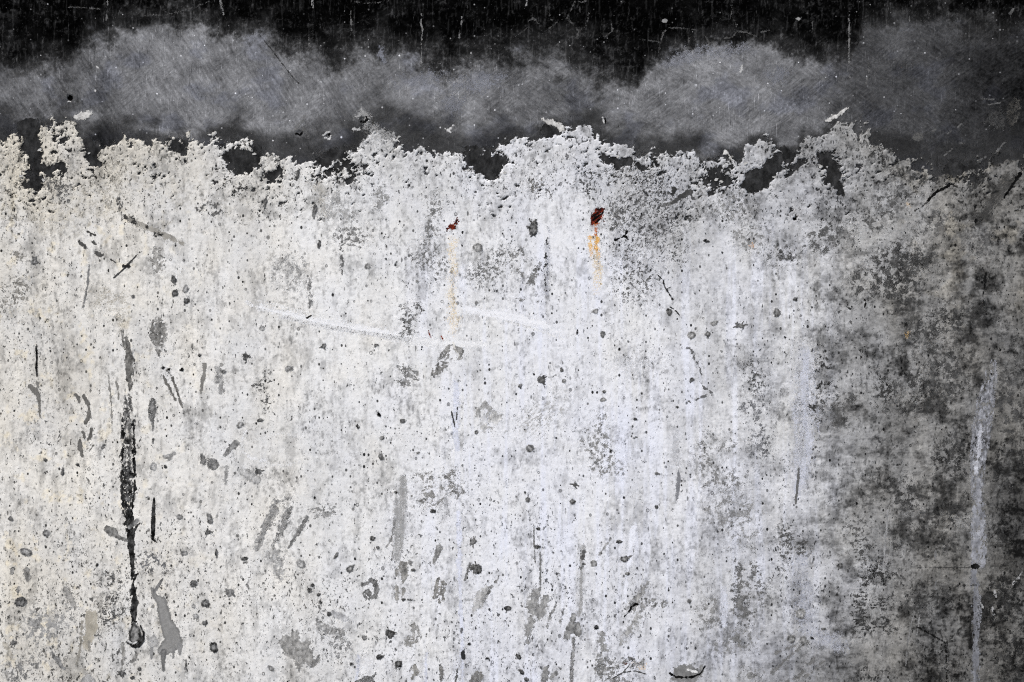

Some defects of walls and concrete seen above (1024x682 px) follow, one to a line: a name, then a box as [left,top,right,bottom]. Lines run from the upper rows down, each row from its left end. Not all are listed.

peeling [16,110,103,197]
peeling [164,138,190,162]
peeling [219,143,283,189]
peeling [295,115,368,185]
peeling [462,144,515,181]
peeling [540,117,565,138]
peeling [599,149,658,171]
peeling [694,145,846,197]
rust [428,215,463,340]
rust [587,208,605,294]
water stain [572,148,1024,682]
water stain [0,284,179,682]